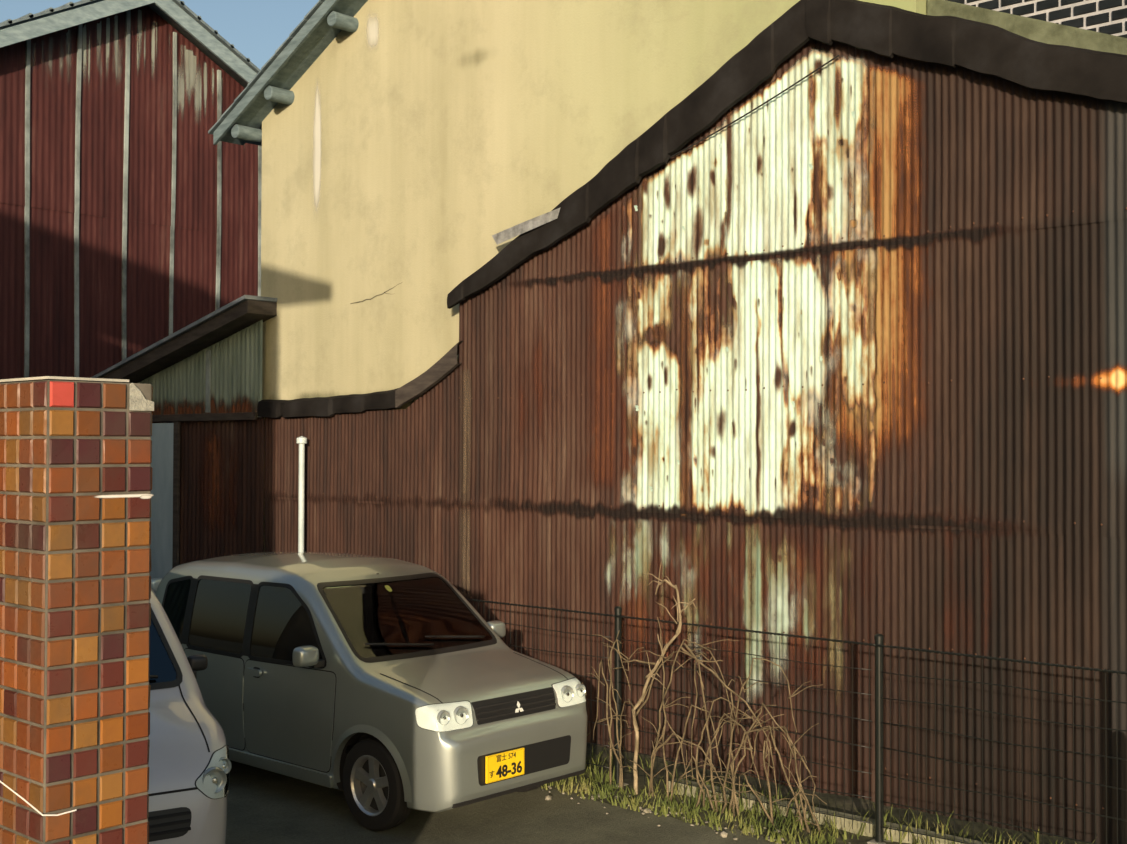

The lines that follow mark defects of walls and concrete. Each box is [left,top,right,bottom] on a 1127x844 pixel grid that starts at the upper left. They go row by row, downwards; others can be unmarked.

corrosion [269,341,1014,680]
peeling [607,49,877,699]
corrosion [514,66,1008,486]
corrosion [1093,366,1127,393]